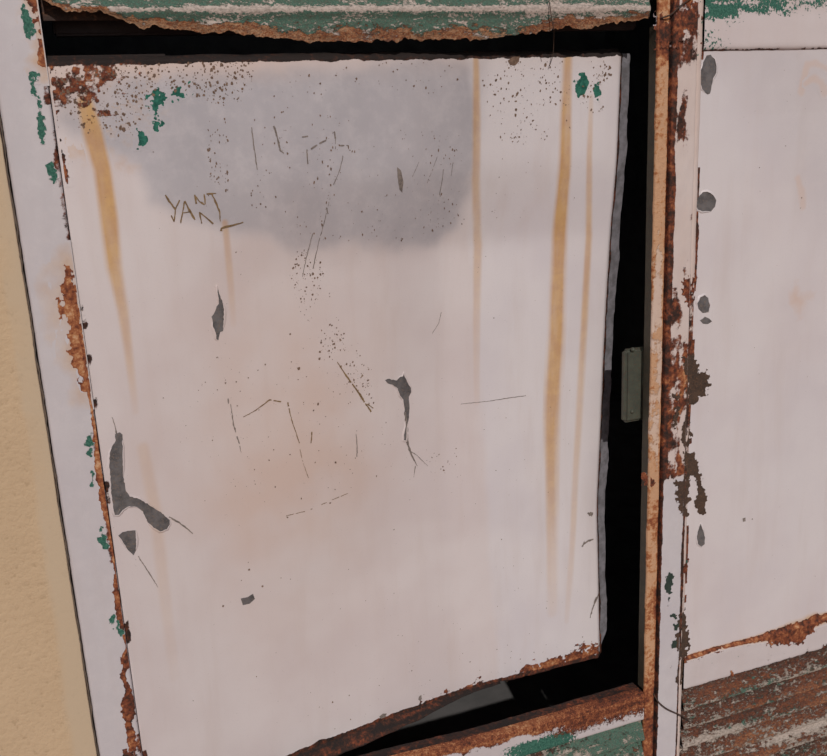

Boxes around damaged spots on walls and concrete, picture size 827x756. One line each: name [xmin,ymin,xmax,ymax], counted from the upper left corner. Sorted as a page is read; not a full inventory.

peeling [700,55,718,94]
rust [10,0,253,416]
peeling [697,189,716,214]
peeling [211,284,227,340]
rust [430,50,612,625]
rust [681,273,695,308]
peeling [695,293,712,324]
peeling [385,372,428,474]
rust [32,240,138,756]
peeling [106,418,193,534]
rust [510,634,601,677]
rust [675,609,827,685]